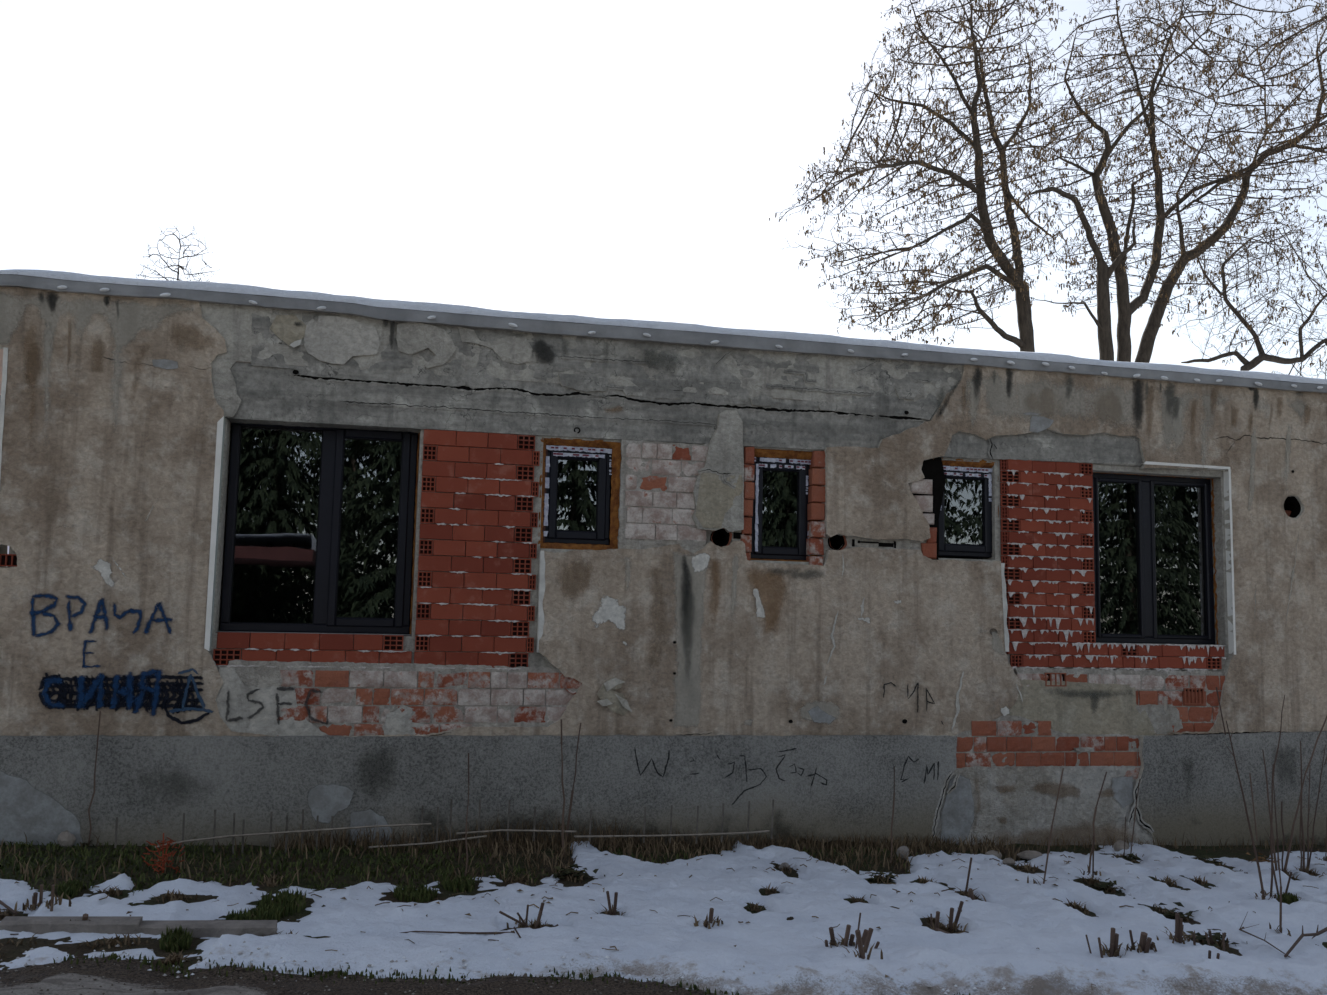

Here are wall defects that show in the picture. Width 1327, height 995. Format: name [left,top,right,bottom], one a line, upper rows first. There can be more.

spalling [251,309,962,560]
crack [294,354,938,427]
water stain [937,368,1222,456]
water stain [674,552,710,726]
spalling [216,660,582,736]
spalling [929,667,1226,845]
crack [1127,778,1154,833]